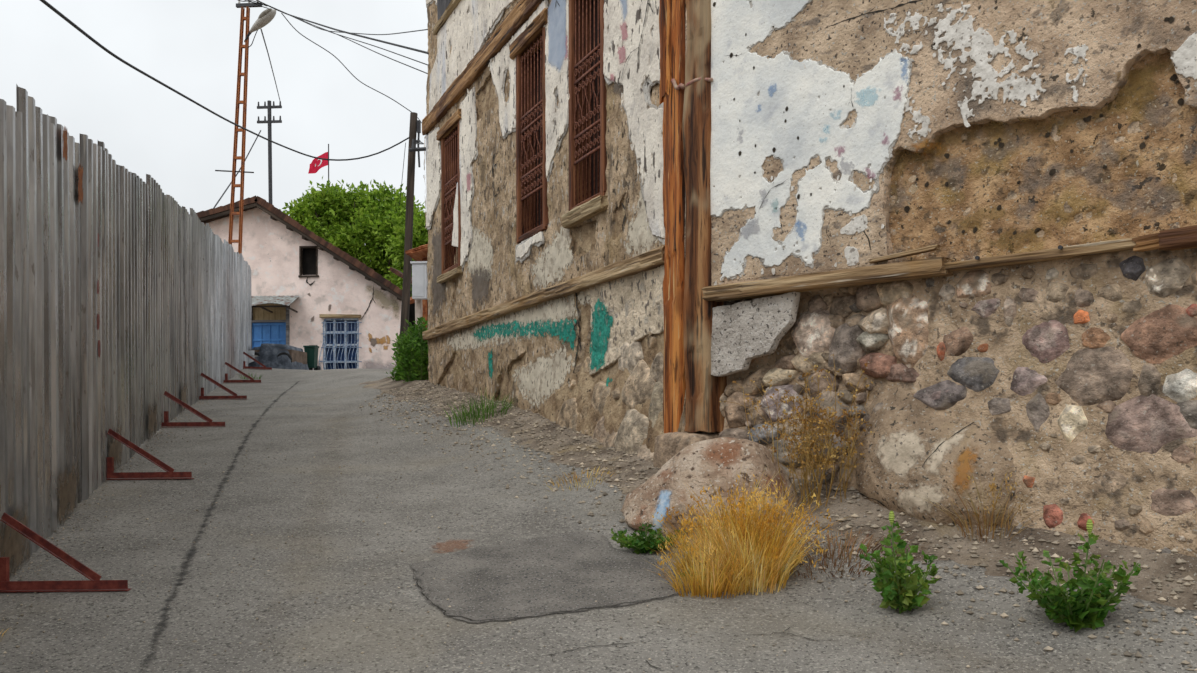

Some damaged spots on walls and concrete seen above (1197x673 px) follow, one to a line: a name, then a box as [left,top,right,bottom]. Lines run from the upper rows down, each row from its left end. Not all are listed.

crack [819,0,921,31]
spalling [467,58,515,132]
spalling [711,0,1197,286]
peeling [452,183,493,304]
peeling [625,190,664,257]